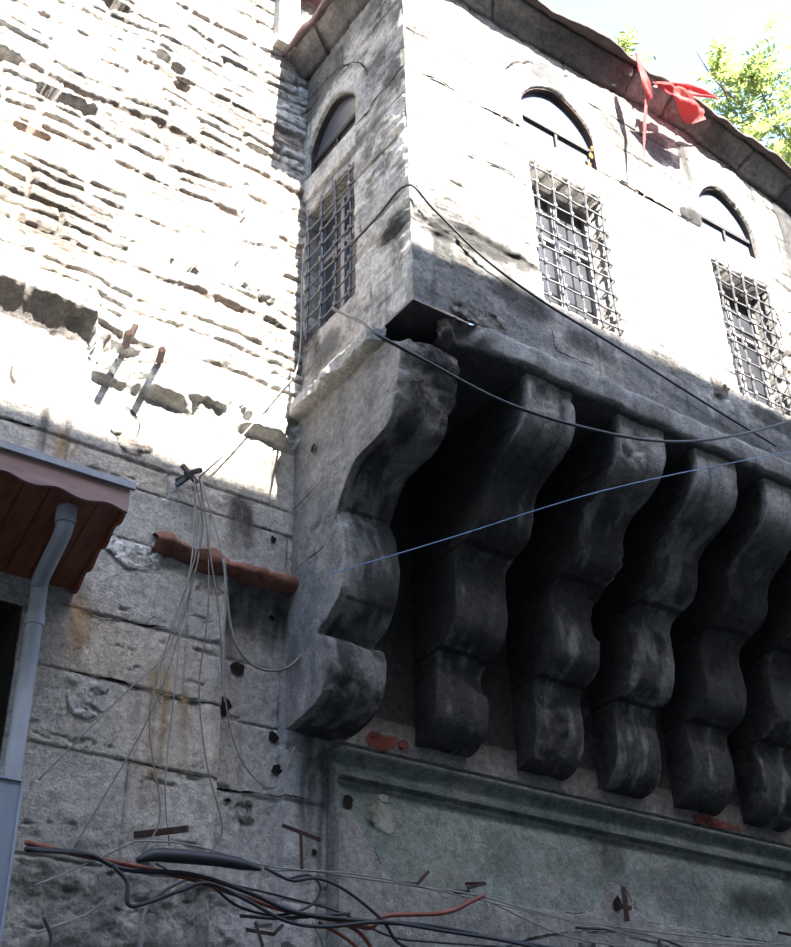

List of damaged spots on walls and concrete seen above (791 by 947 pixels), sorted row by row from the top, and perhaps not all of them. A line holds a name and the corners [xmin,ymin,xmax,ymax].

spalling [84,339,143,380]
spalling [111,424,154,455]
peeling [368,792,405,834]